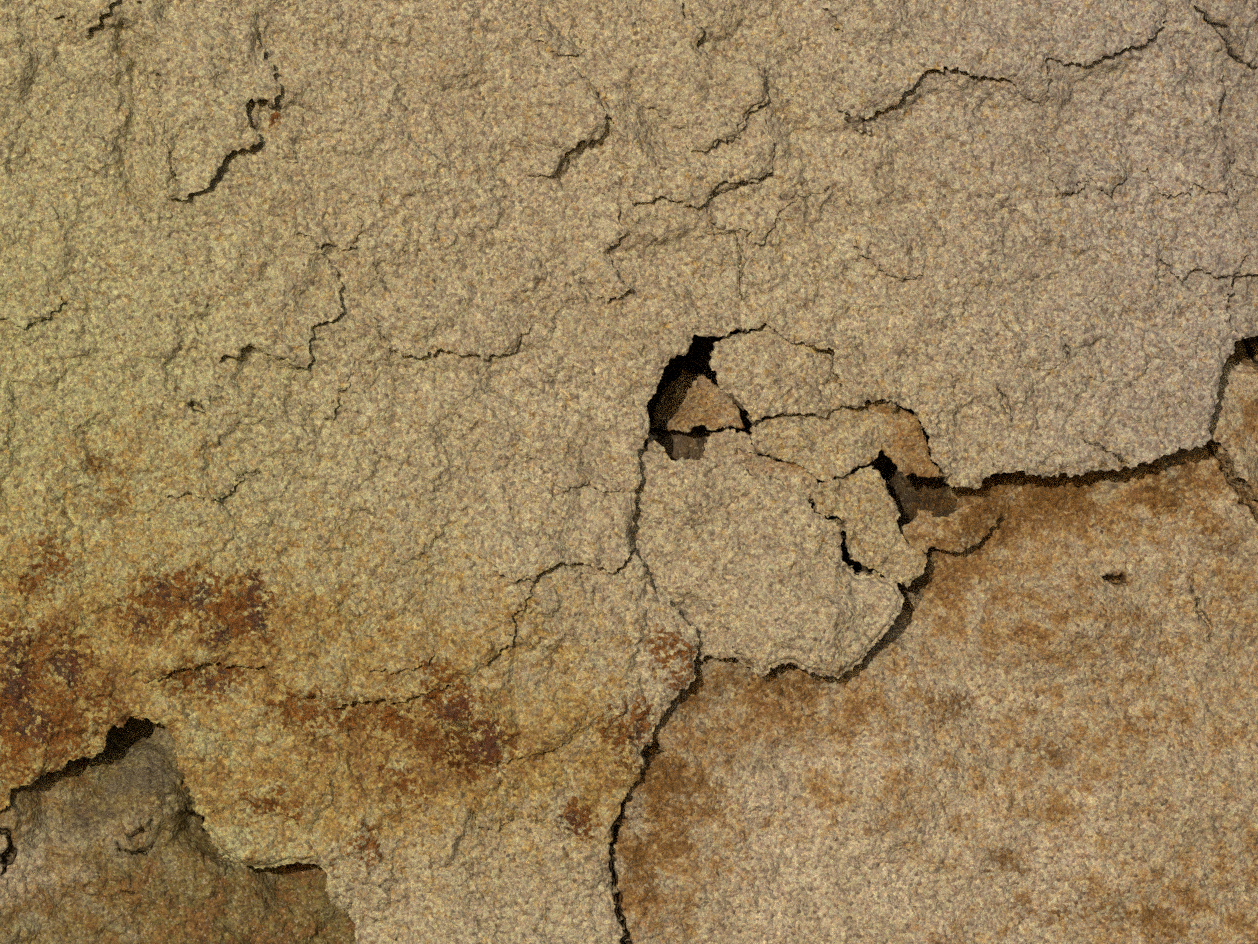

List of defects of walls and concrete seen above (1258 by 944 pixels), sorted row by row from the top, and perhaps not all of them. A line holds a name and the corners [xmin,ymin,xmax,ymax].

crack [1194,5,1258,69]
spalling [1225,335,1258,371]
crack [1244,340,1258,364]
crack [1206,440,1258,521]
corrosion [0,620,130,804]
corrosion [114,565,289,705]
corrosion [258,656,520,809]
corrosion [598,686,707,814]
corrosion [645,623,840,714]
spalling [612,442,1258,944]
spalling [0,716,356,944]
crack [609,793,632,944]